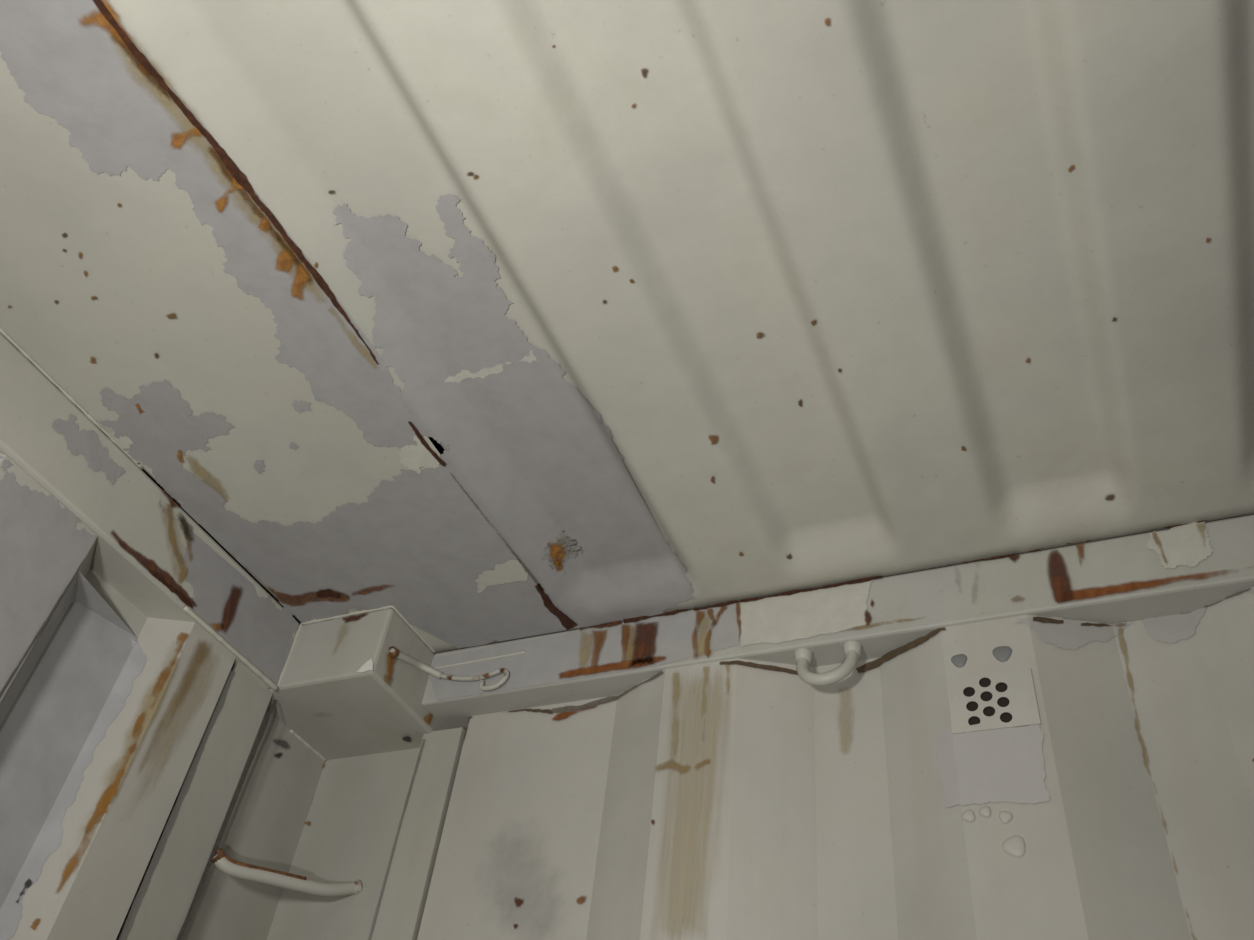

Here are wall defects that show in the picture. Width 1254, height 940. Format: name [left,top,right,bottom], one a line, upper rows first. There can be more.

rust [82,0,378,366]
peeling [0,0,872,700]
rust [397,421,450,474]
rust [111,490,197,609]
rust [213,587,241,631]
rust [268,585,388,606]
rust [507,545,882,678]
rust [963,538,1217,602]
rust [1153,520,1207,562]
peeling [0,455,147,940]
rust [85,643,207,835]
rust [58,854,78,891]